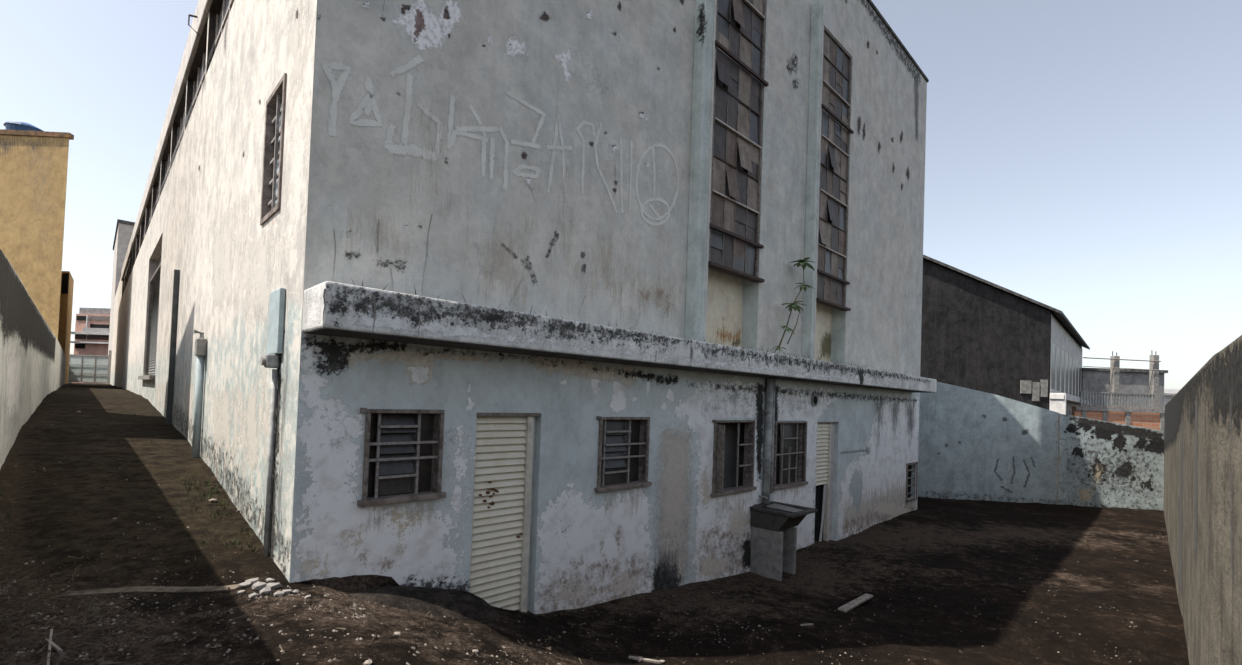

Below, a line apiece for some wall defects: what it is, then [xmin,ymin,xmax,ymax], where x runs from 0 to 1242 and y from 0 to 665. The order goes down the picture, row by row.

flaking render [362,0,464,52]
leakage [0,249,56,362]
leakage [172,354,291,576]
peeling [291,333,475,589]
peeling [534,483,656,614]
leakage [302,282,931,478]
peeling [346,307,920,582]
leakage [651,550,682,592]
rust [717,329,741,347]
leakage [922,339,1242,593]